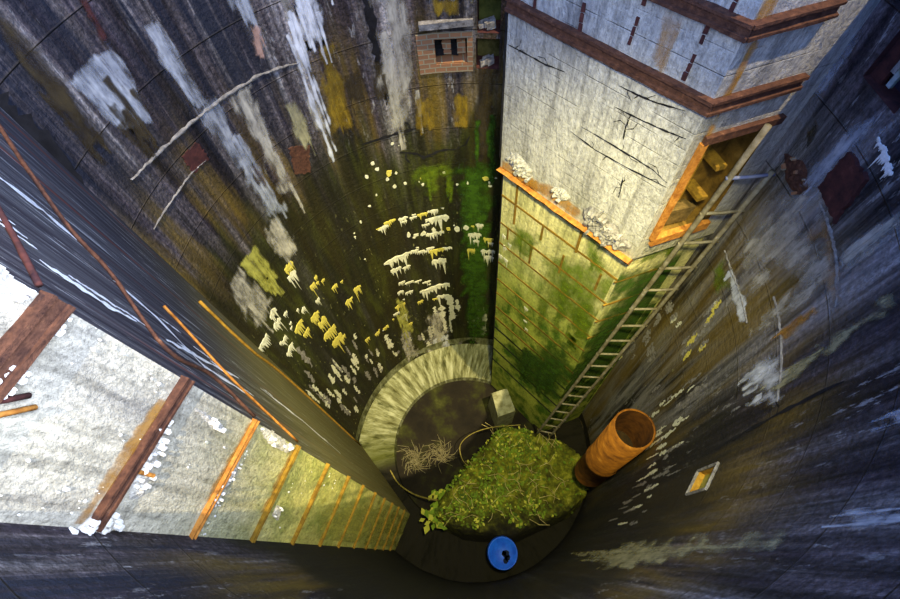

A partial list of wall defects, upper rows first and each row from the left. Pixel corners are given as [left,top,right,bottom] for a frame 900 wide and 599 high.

rust [757,0,775,19]
water stain [0,19,159,163]
water stain [286,0,365,162]
water stain [374,0,431,149]
crack [507,41,564,72]
rust [724,42,757,97]
crack [573,86,686,198]
water stain [396,299,418,361]
water stain [428,313,449,351]